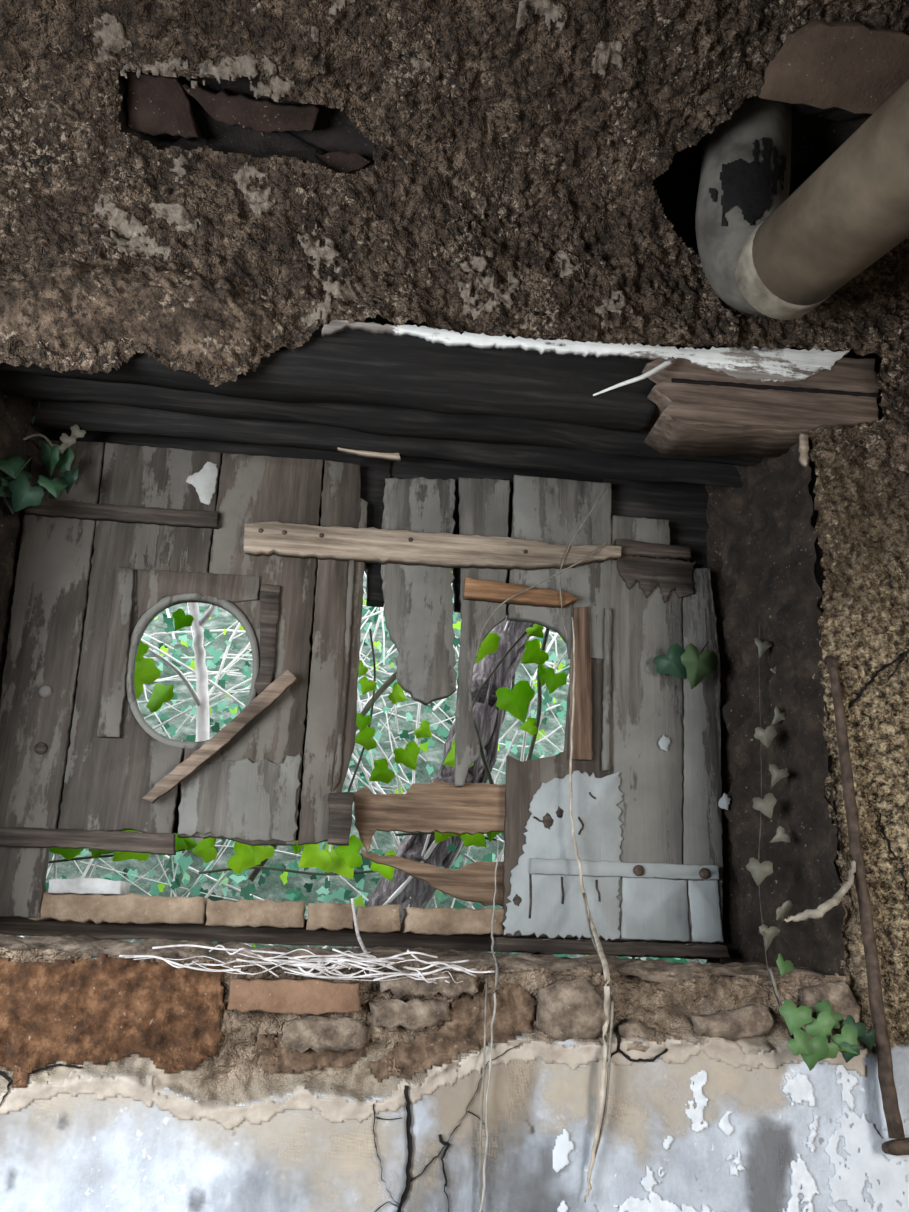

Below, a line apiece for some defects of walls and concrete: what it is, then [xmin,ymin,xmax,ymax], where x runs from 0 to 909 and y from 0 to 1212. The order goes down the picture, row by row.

spalling [89,12,375,216]
crack [371,1043,521,1212]
flaking render [0,954,909,1212]
water stain [408,1032,790,1212]